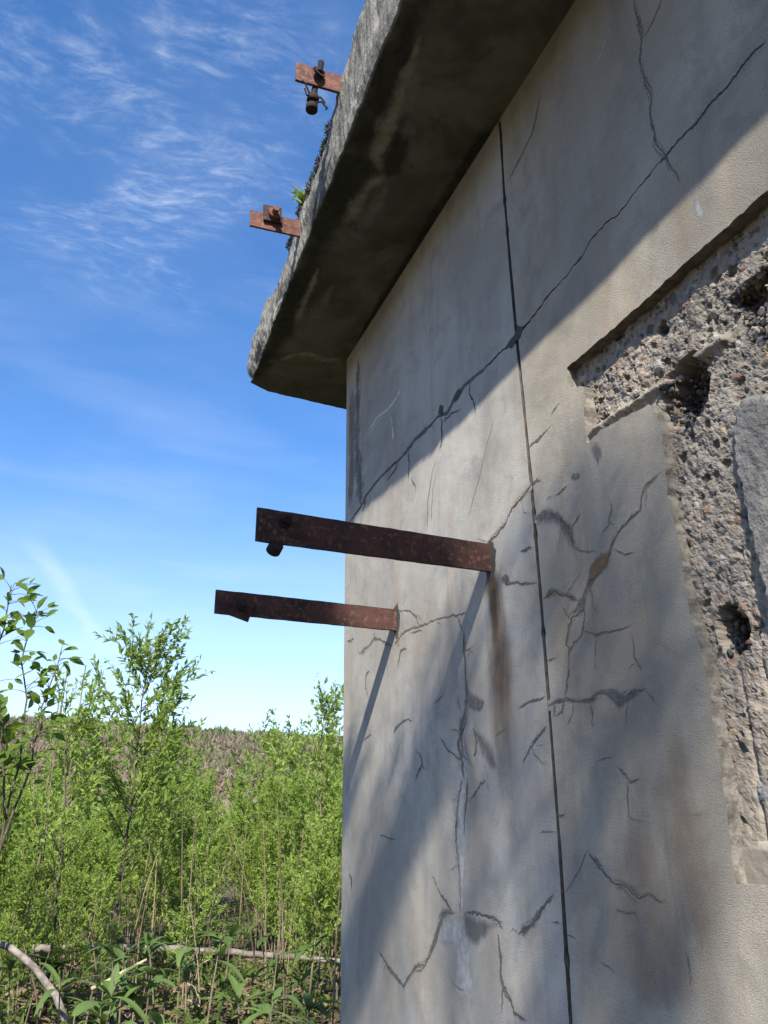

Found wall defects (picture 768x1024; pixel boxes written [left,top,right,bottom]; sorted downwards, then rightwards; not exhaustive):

damp [253,6,419,377]
damp [359,129,492,339]
crack [351,0,765,520]
spalling [576,206,768,885]
crack [347,609,667,1020]